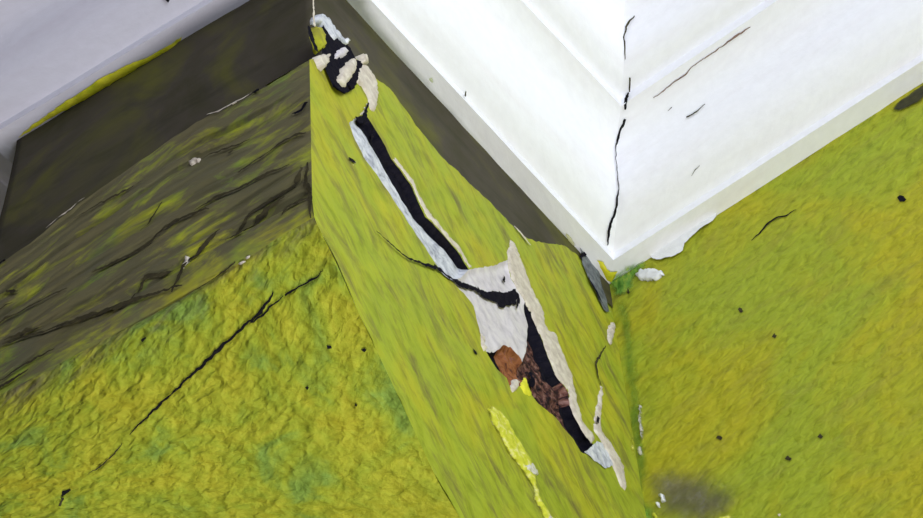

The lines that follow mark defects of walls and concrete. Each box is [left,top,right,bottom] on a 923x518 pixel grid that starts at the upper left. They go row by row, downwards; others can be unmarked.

spalling [308,0,379,111]
crack [607,16,635,245]
crack [653,27,750,98]
damp [894,85,923,110]
crack [752,210,794,240]
crack [90,271,322,473]
spalling [454,226,613,468]
flaking render [607,322,616,345]
crack [59,489,71,506]
peeling [488,406,553,518]
damp [655,480,722,513]